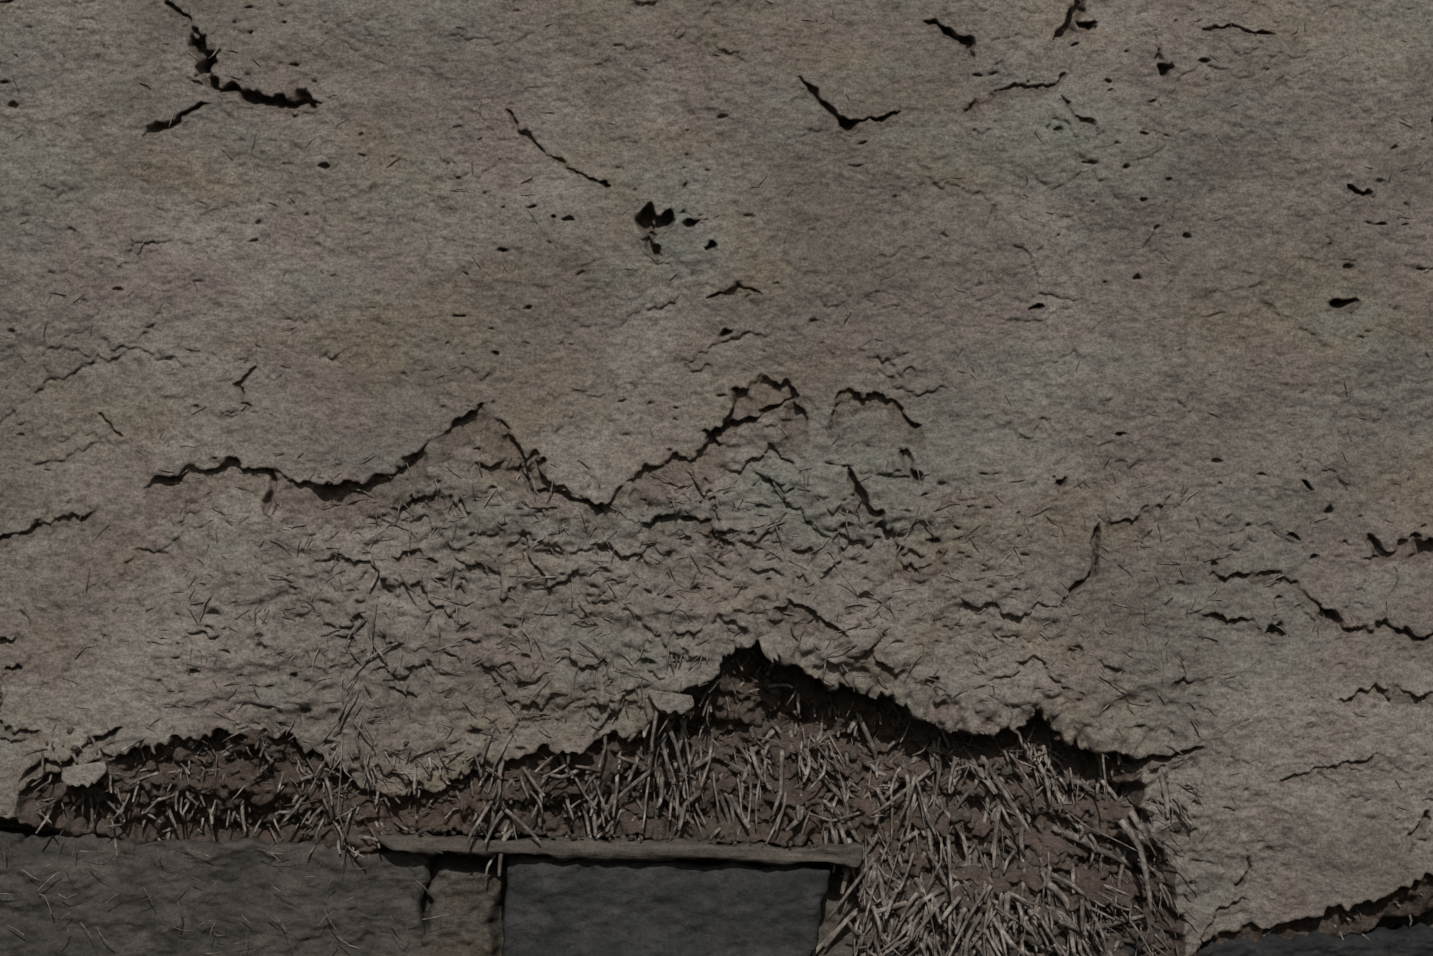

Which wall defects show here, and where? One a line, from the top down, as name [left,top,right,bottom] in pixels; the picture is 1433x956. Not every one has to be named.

crack [0,0,21,8]
crack [142,0,322,137]
crack [798,76,901,133]
crack [922,17,977,60]
crack [962,0,1100,132]
crack [1198,569,1433,649]
crack [1328,680,1433,710]
spalling [0,596,1433,956]